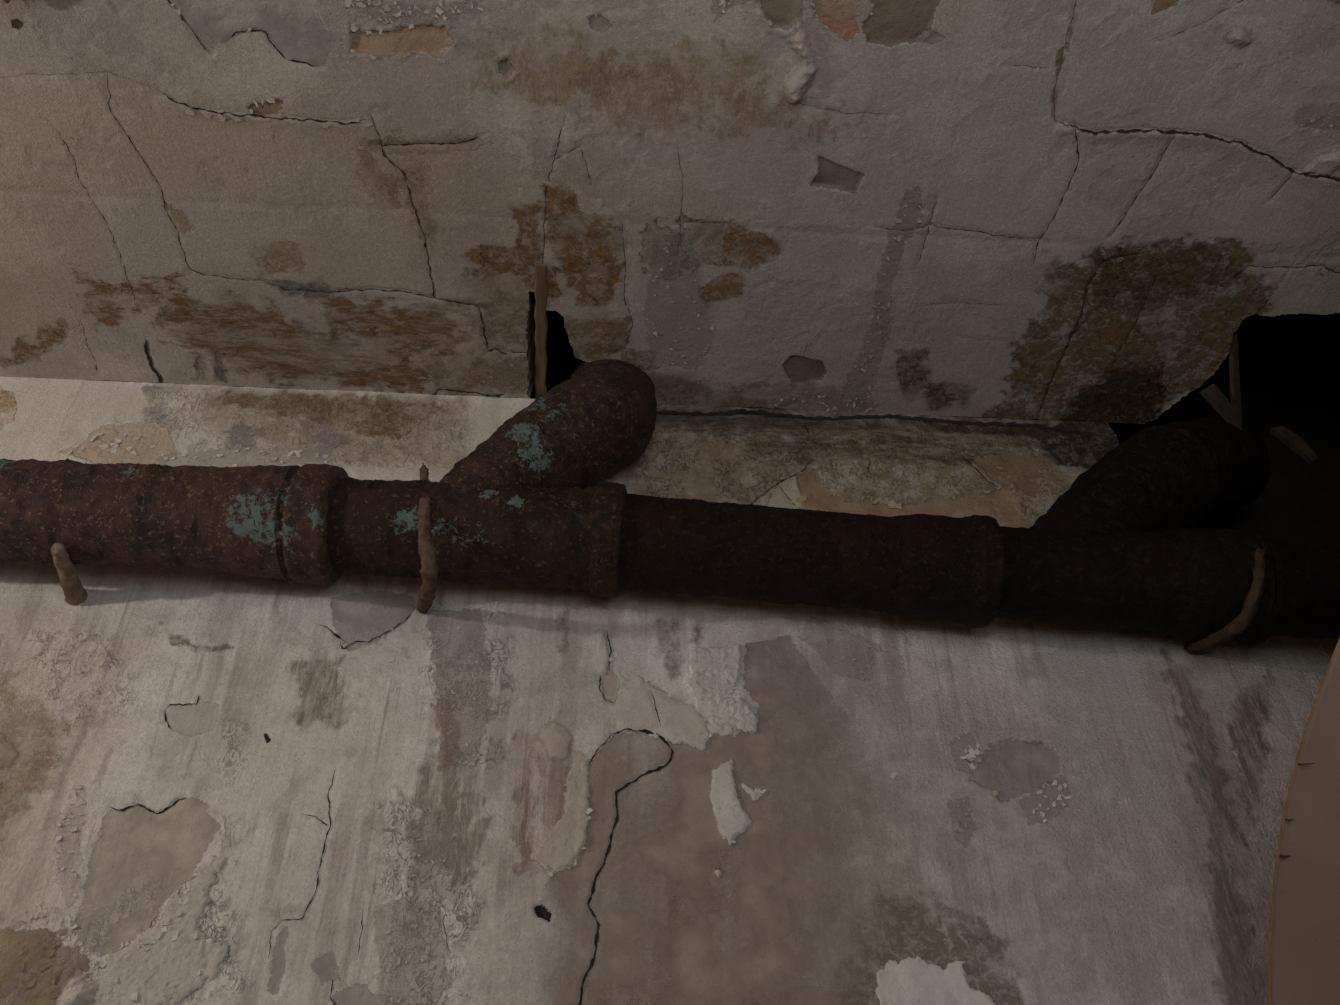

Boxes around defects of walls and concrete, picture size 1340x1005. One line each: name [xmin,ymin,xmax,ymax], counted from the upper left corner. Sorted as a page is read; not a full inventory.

flaking render [349,0,484,60]
flaking render [761,0,947,47]
flaking render [1151,0,1178,14]
crack [144,339,162,383]
crack [1,71,528,355]
crack [433,389,506,397]
crack [656,0,1340,506]
damp [924,233,1272,439]
peeling [0,796,228,1005]
crack [578,633,674,1005]
peeling [530,636,841,1005]
peeling [876,956,996,1005]